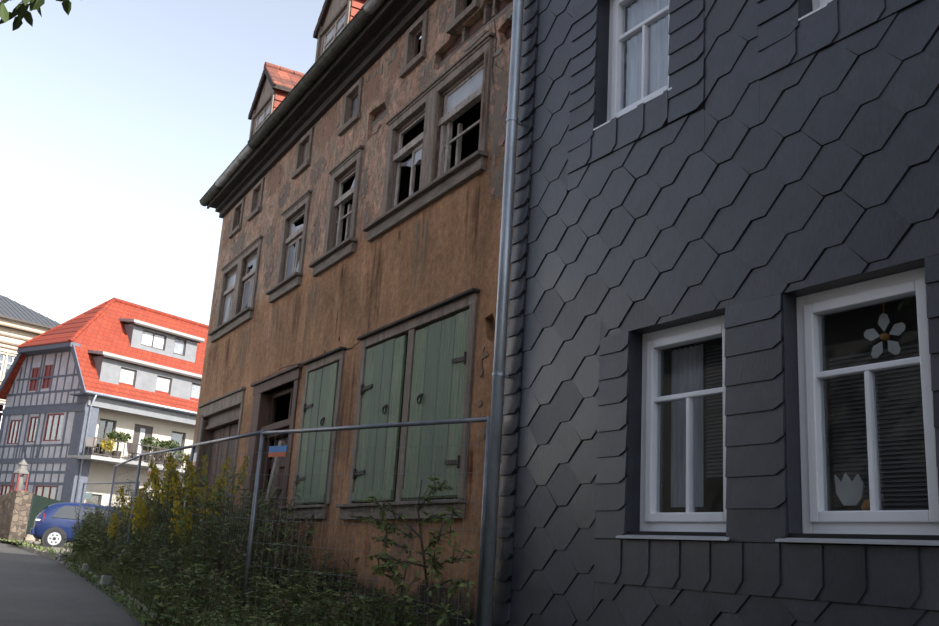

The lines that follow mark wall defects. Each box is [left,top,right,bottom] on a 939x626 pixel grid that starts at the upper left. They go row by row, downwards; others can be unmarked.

flaking render [429,0,513,84]